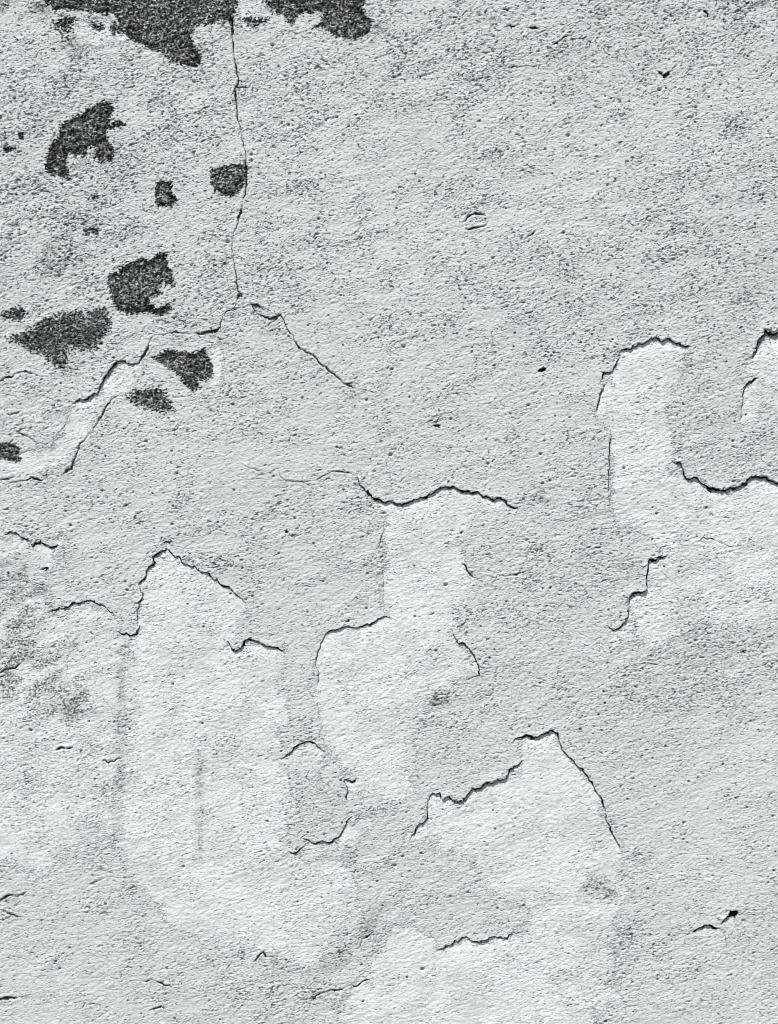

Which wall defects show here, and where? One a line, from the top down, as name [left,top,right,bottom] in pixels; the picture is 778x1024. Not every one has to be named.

crack [139,18,358,388]
peeling [588,325,778,656]
peeling [0,471,634,1024]